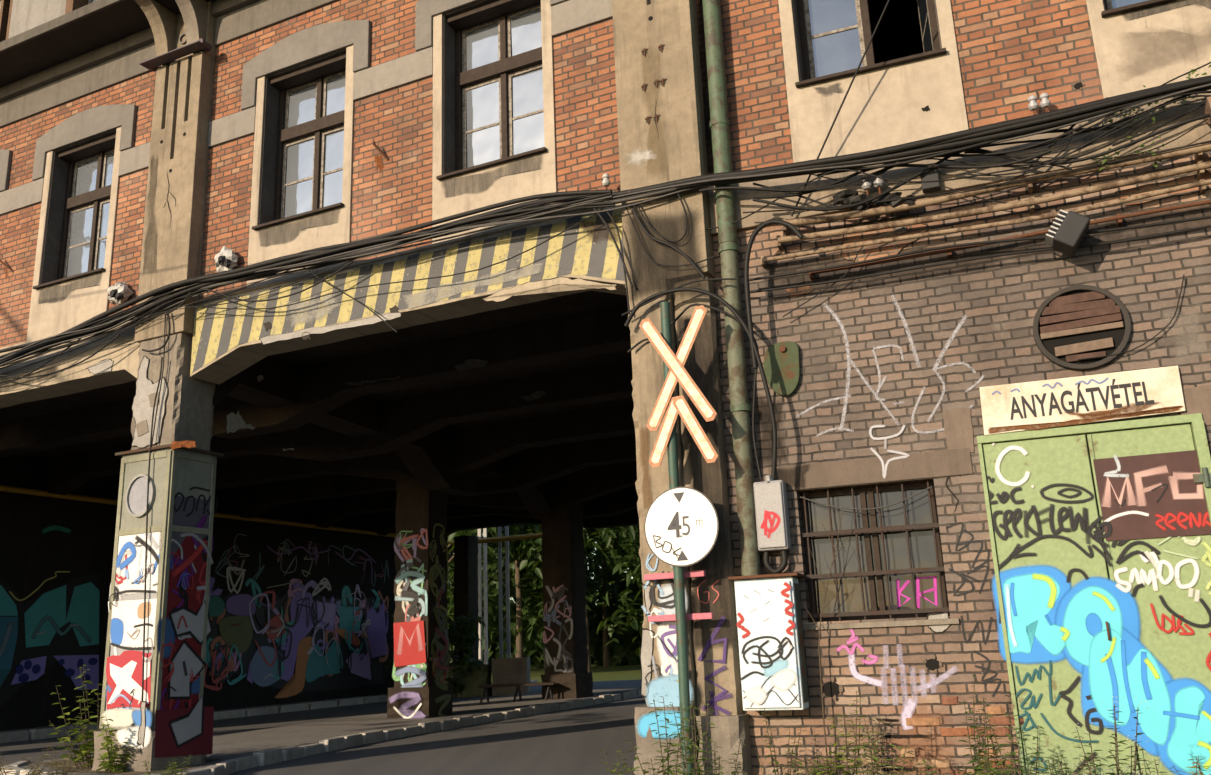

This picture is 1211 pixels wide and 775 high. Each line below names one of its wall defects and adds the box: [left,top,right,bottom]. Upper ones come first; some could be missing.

spalling [131,356,168,448]
peeling [227,411,255,434]
corrosion [989,403,1182,434]